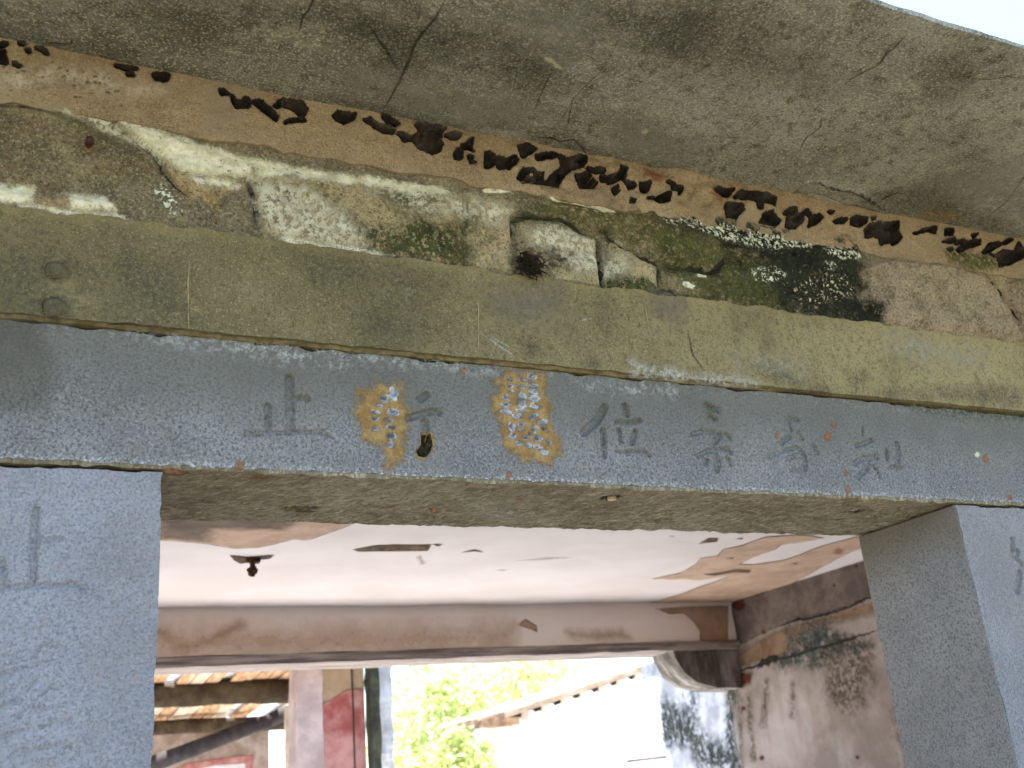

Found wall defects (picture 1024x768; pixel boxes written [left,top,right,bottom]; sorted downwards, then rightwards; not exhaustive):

spalling [0,40,50,69]
spalling [152,71,171,83]
spalling [218,87,309,125]
crack [371,12,439,108]
damp [0,184,125,219]
damp [62,109,690,279]
spalling [332,109,684,204]
spalling [714,185,1024,267]
spalling [416,431,435,460]
peeling [355,544,441,552]
peeling [650,535,874,668]
damp [779,621,874,704]